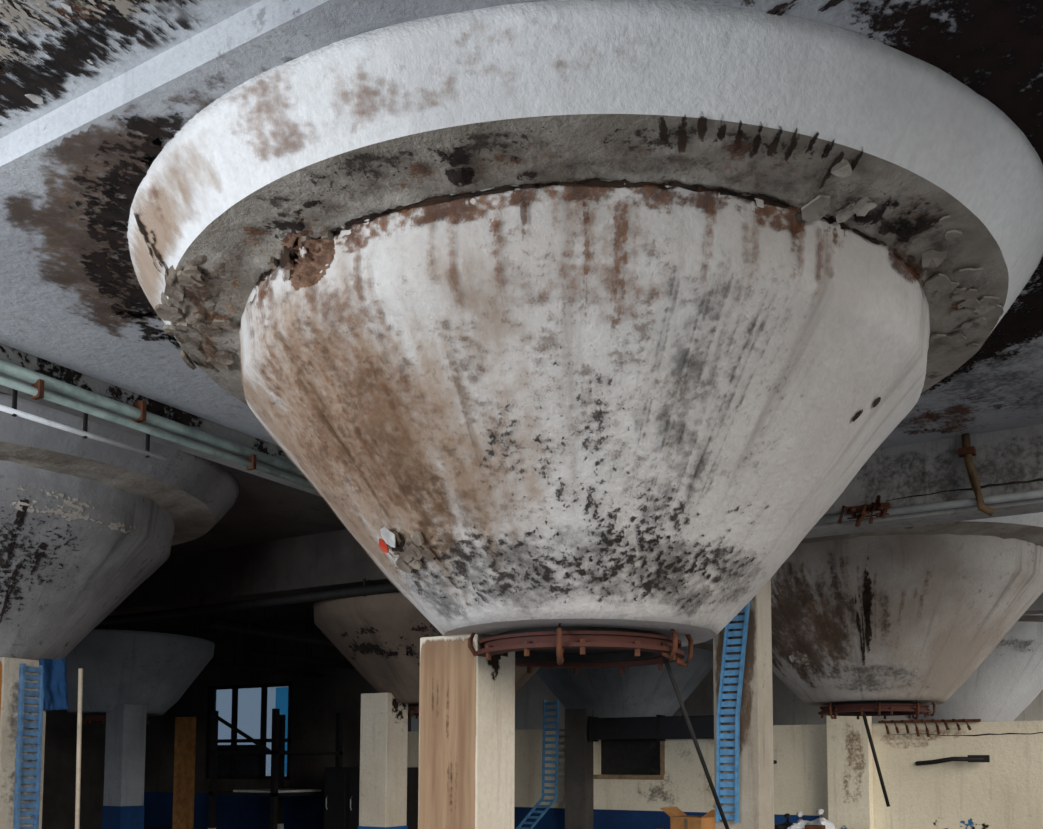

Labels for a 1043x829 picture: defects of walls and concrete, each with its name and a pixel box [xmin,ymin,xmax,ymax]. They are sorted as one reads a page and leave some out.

crack [256,261,280,286]
corrosion [250,263,295,309]
corrosion [243,200,324,252]
crack [317,178,790,239]
corrosion [309,142,805,330]
crack [822,216,887,246]
corrosion [826,193,942,283]
water stain [920,258,1043,405]
water stain [105,386,203,428]
water stain [0,487,137,623]
water stain [241,308,756,754]
water stain [342,623,476,829]